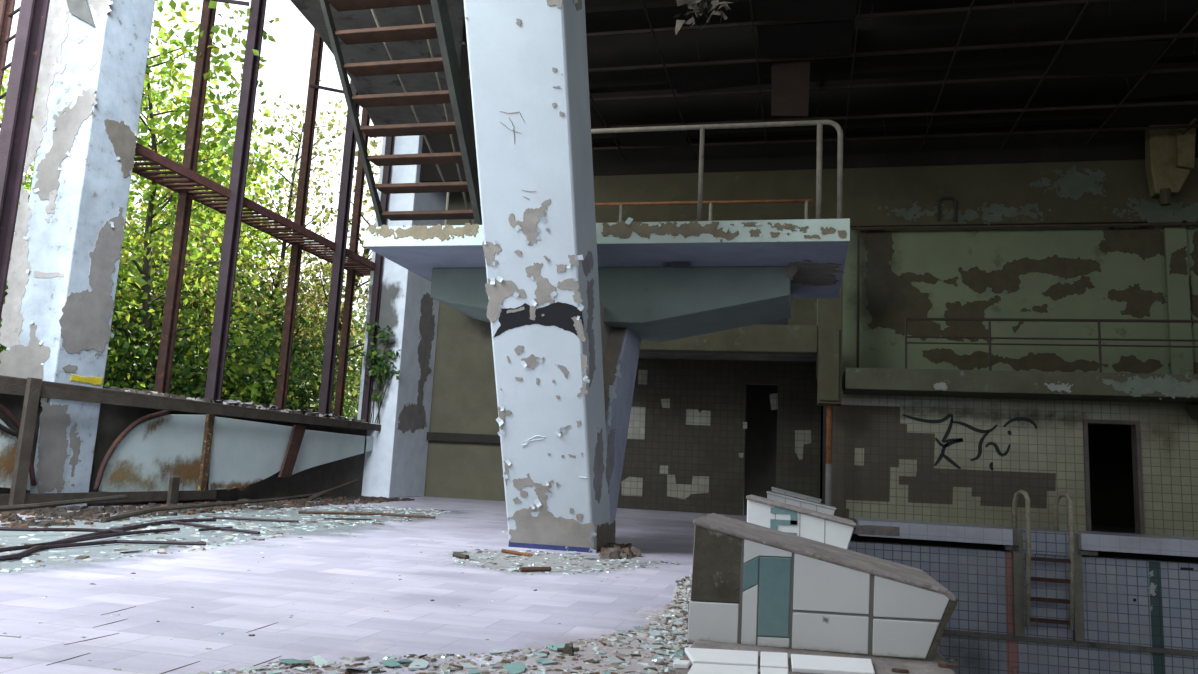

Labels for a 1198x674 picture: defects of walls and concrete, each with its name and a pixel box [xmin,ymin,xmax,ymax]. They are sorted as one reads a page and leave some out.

peeling [546,0,563,8]
peeling [0,0,138,381]
peeling [601,217,847,242]
peeling [786,260,846,286]
peeling [864,165,1198,400]
peeling [366,199,626,504]
corrosion [109,459,261,490]
peeling [503,459,616,553]
peeling [832,405,1056,536]